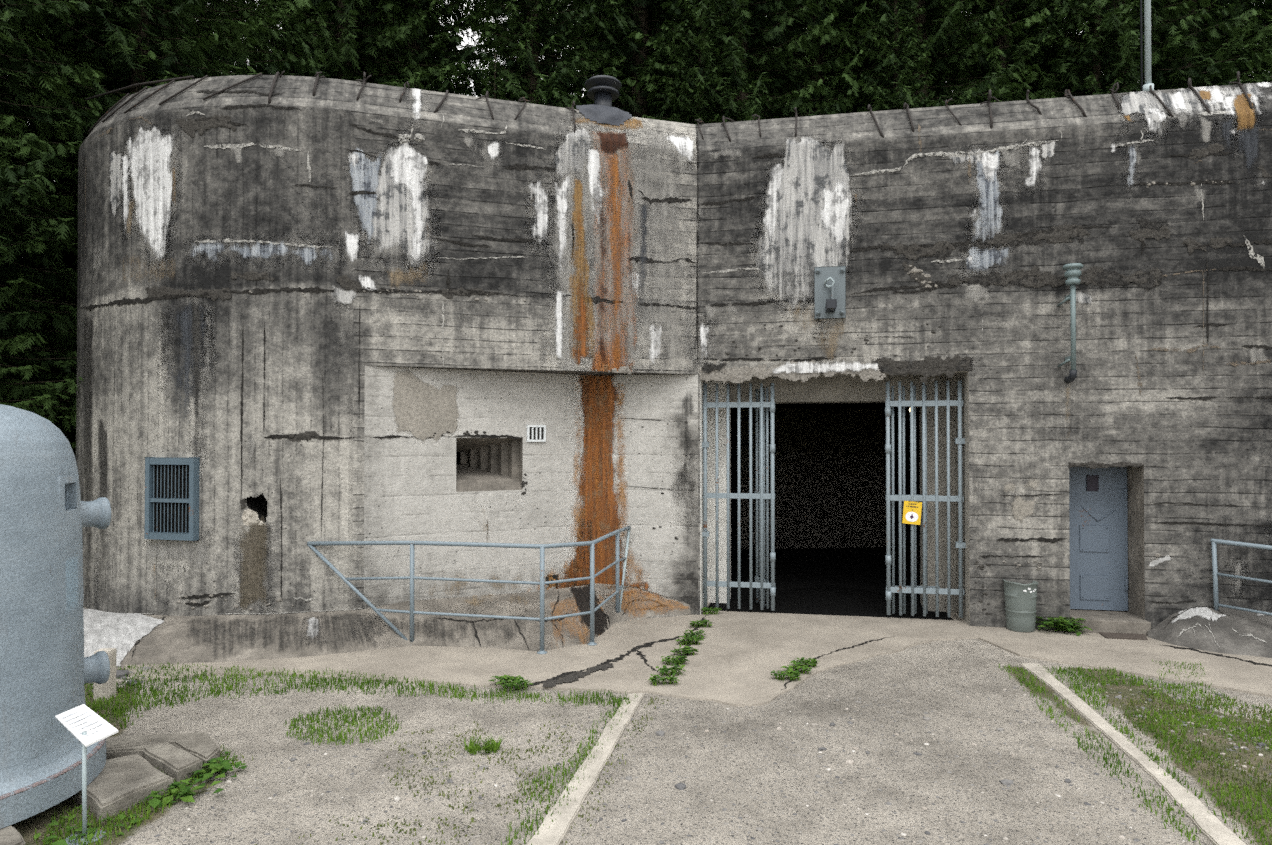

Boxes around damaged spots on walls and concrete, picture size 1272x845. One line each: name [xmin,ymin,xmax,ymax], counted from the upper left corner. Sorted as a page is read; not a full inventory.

corrosion [545,118,687,615]
spalling [699,354,973,384]
spalling [240,493,267,526]